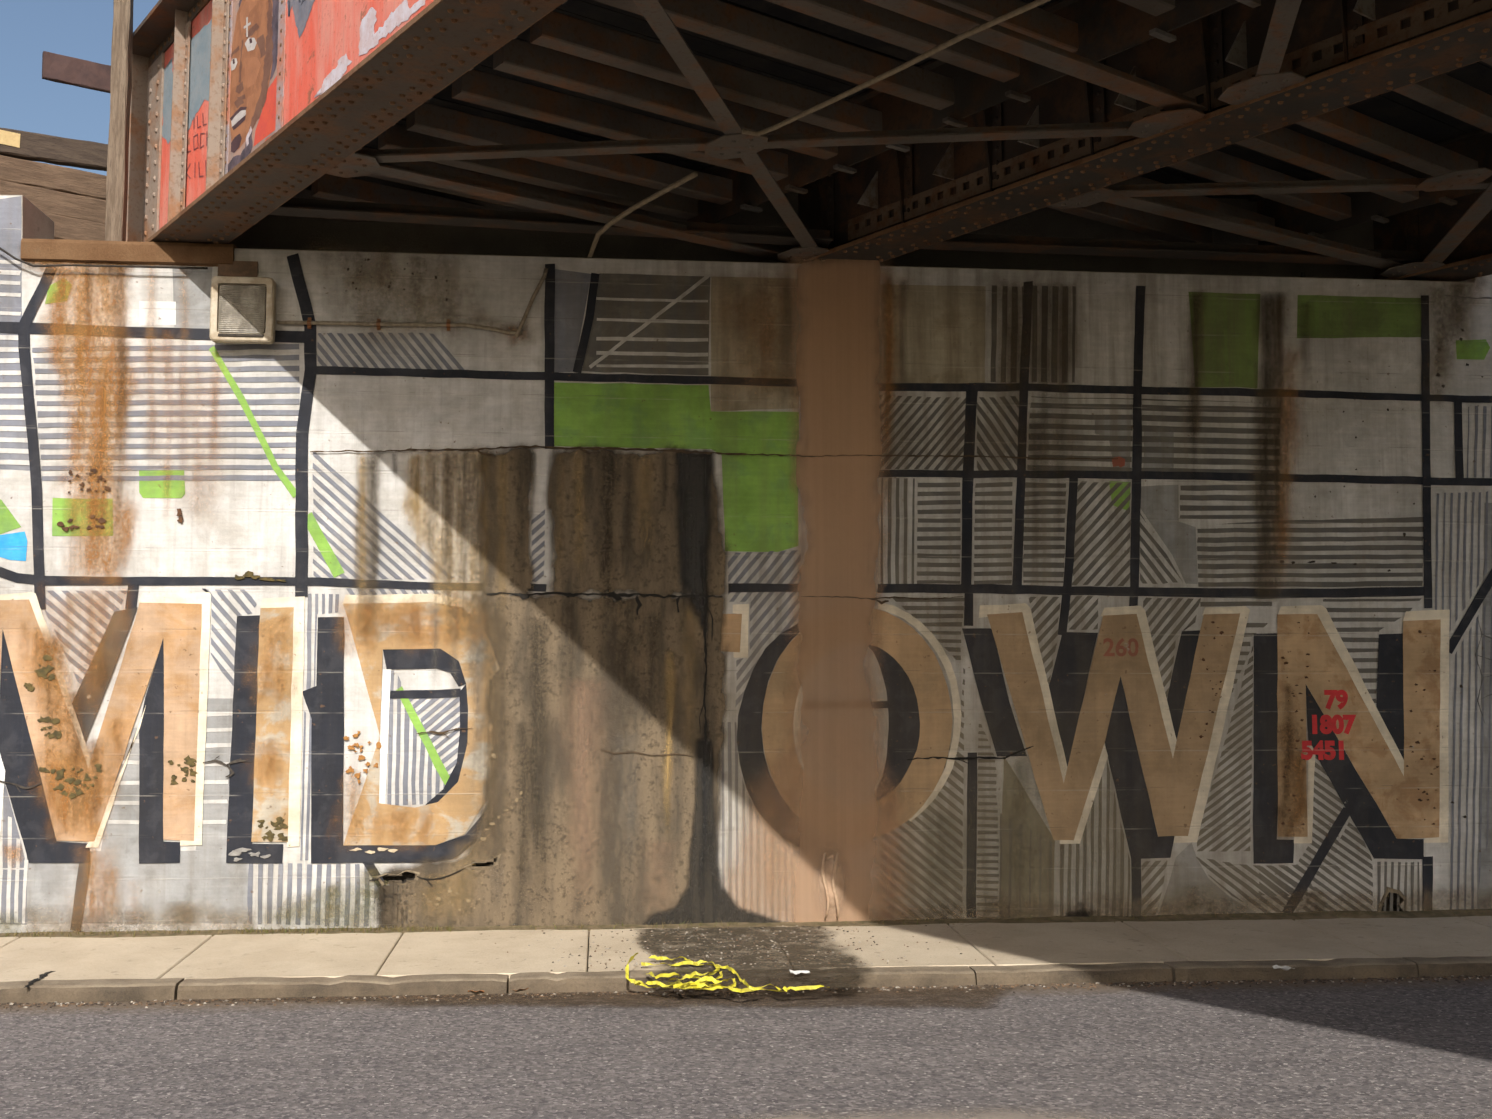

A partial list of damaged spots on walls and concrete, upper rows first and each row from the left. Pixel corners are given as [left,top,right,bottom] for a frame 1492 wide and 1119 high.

rust [29,261,132,579]
leakage [356,457,378,631]
leakage [394,452,504,736]
peeling [350,447,728,928]
crack [487,570,723,760]
crack [801,596,963,605]
crack [907,746,1033,764]
leakage [1256,296,1283,596]